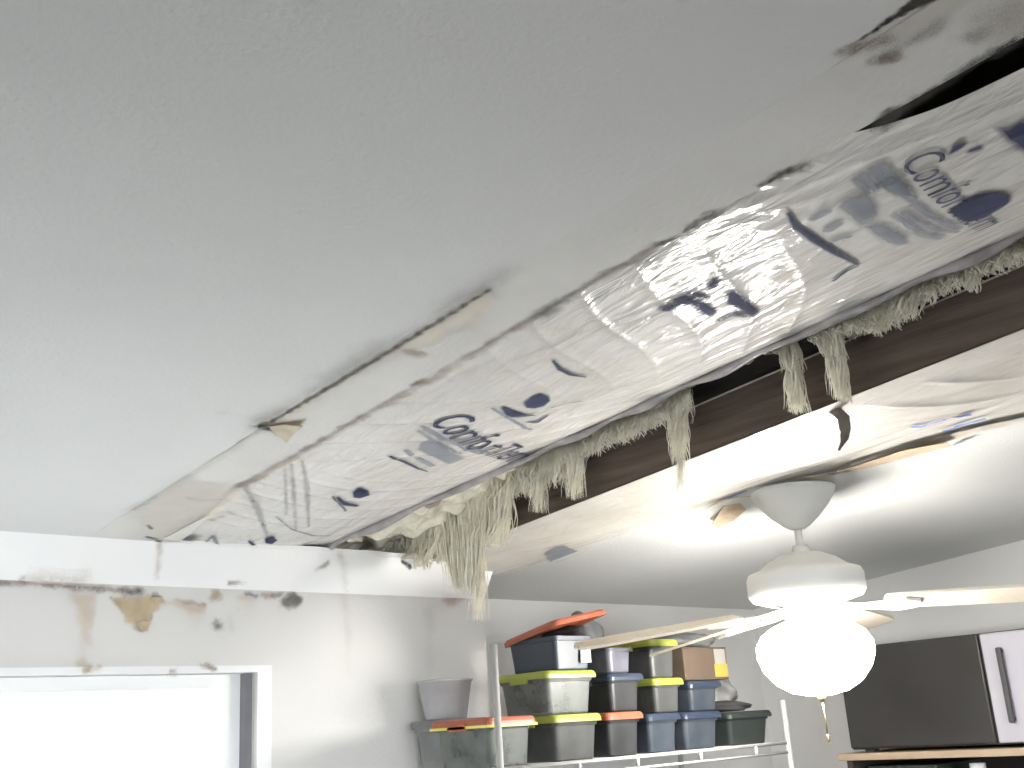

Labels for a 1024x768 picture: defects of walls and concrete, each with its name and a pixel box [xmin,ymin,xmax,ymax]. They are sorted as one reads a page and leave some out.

water stain [862,0,1024,134]
water stain [755,160,819,188]
water stain [653,207,725,247]
peeling [124,443,262,542]
peeling [711,503,746,528]
peeling [109,588,223,633]
water stain [258,591,305,611]